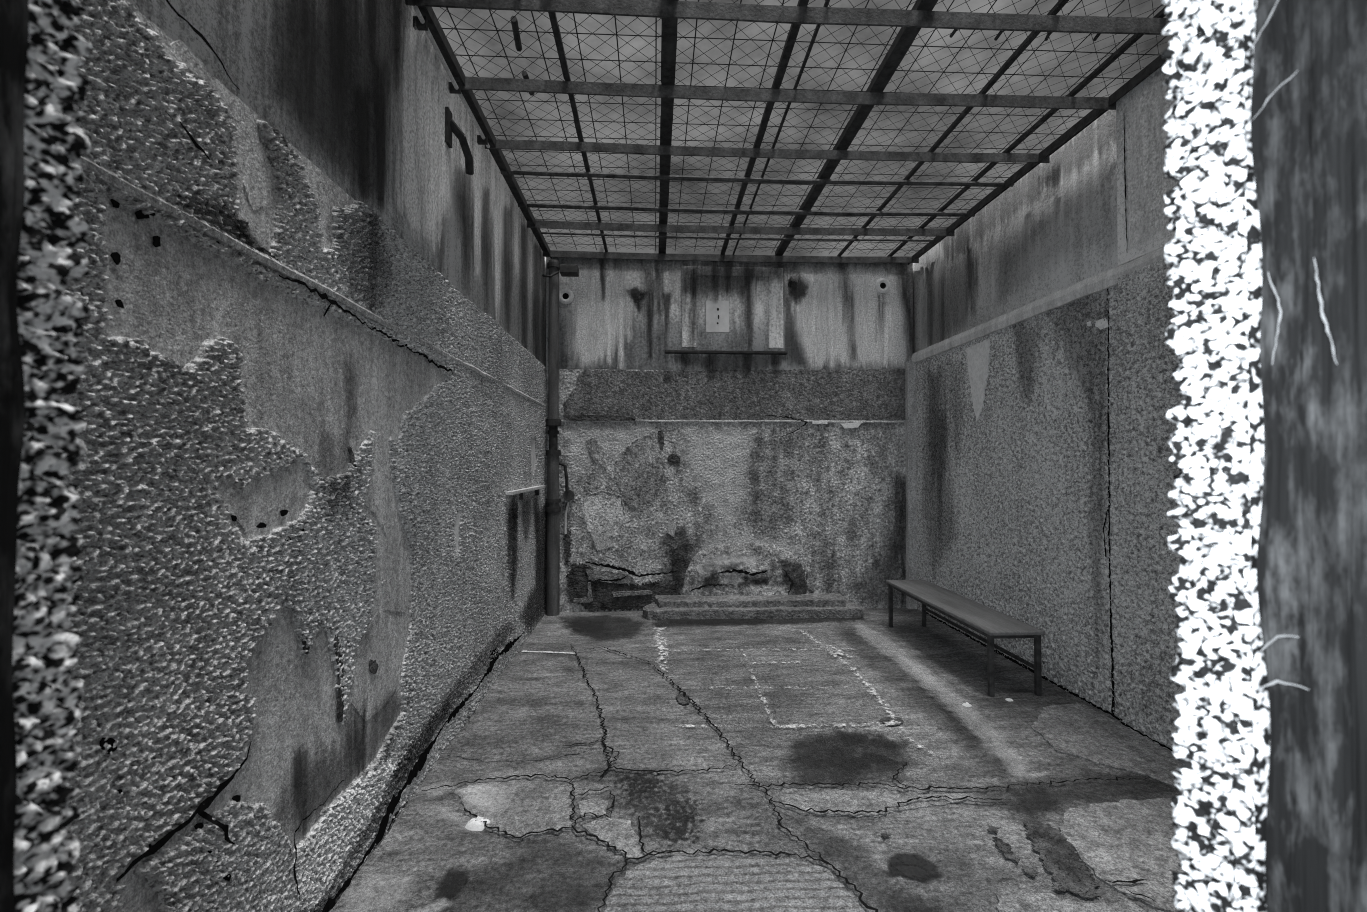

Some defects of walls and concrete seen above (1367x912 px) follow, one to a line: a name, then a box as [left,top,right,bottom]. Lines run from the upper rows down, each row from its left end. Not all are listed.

peeling [122,0,354,260]
water stain [277,0,541,361]
water stain [571,248,913,369]
peeling [97,194,446,912]
peeling [563,402,691,612]
crack [585,562,791,595]
crack [926,289,1173,752]
crack [116,741,252,883]
water stain [614,771,705,847]
crack [293,632,1147,912]
water stain [790,731,908,784]
water stain [887,853,942,882]